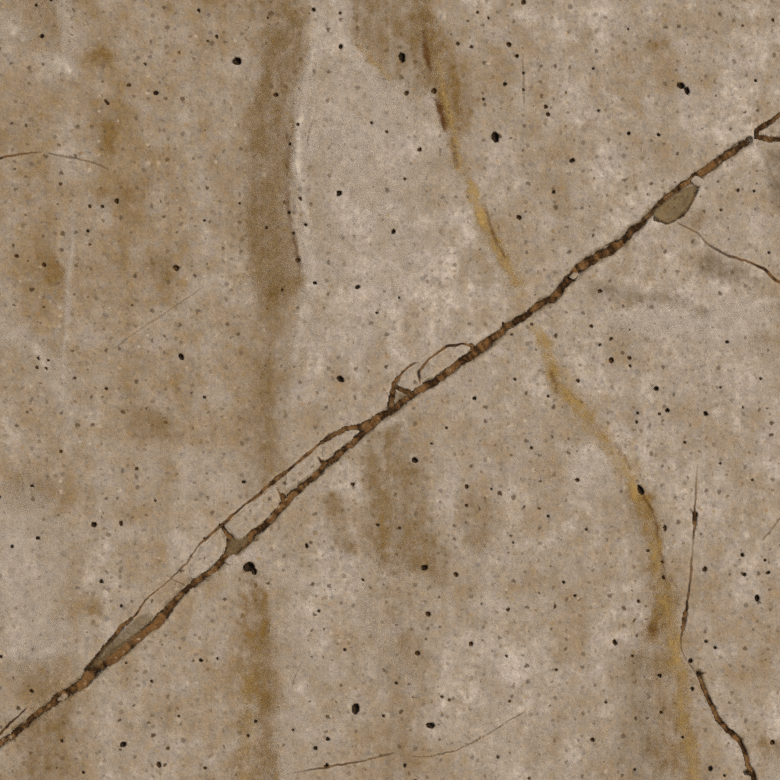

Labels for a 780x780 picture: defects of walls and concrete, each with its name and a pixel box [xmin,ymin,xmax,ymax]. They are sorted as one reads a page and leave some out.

rust [435,66,461,168]
crack [755,113,780,142]
leakage [269,11,326,362]
rust [467,180,517,285]
rust [536,334,592,418]
crack [0,139,780,746]
rust [616,457,662,574]
crack [315,757,375,770]
crack [697,670,756,780]